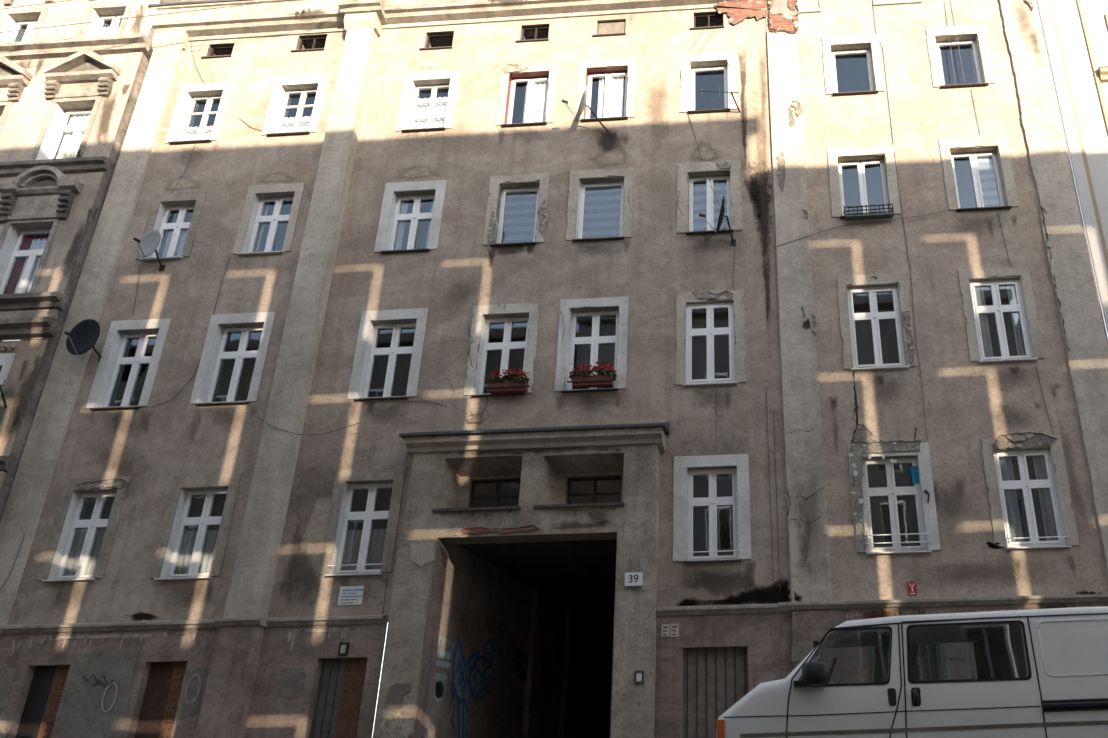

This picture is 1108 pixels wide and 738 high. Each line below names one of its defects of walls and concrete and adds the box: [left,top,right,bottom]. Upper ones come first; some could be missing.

spalling [713,0,799,34]
flaking render [788,101,803,127]
leakage [599,131,627,152]
flaking render [776,152,786,190]
leakage [745,167,772,254]
crack [1041,205,1070,350]
crack [851,371,860,443]
spalling [993,431,1058,450]
spalling [848,424,921,553]
leakage [679,573,802,606]
flaking render [0,710,10,738]